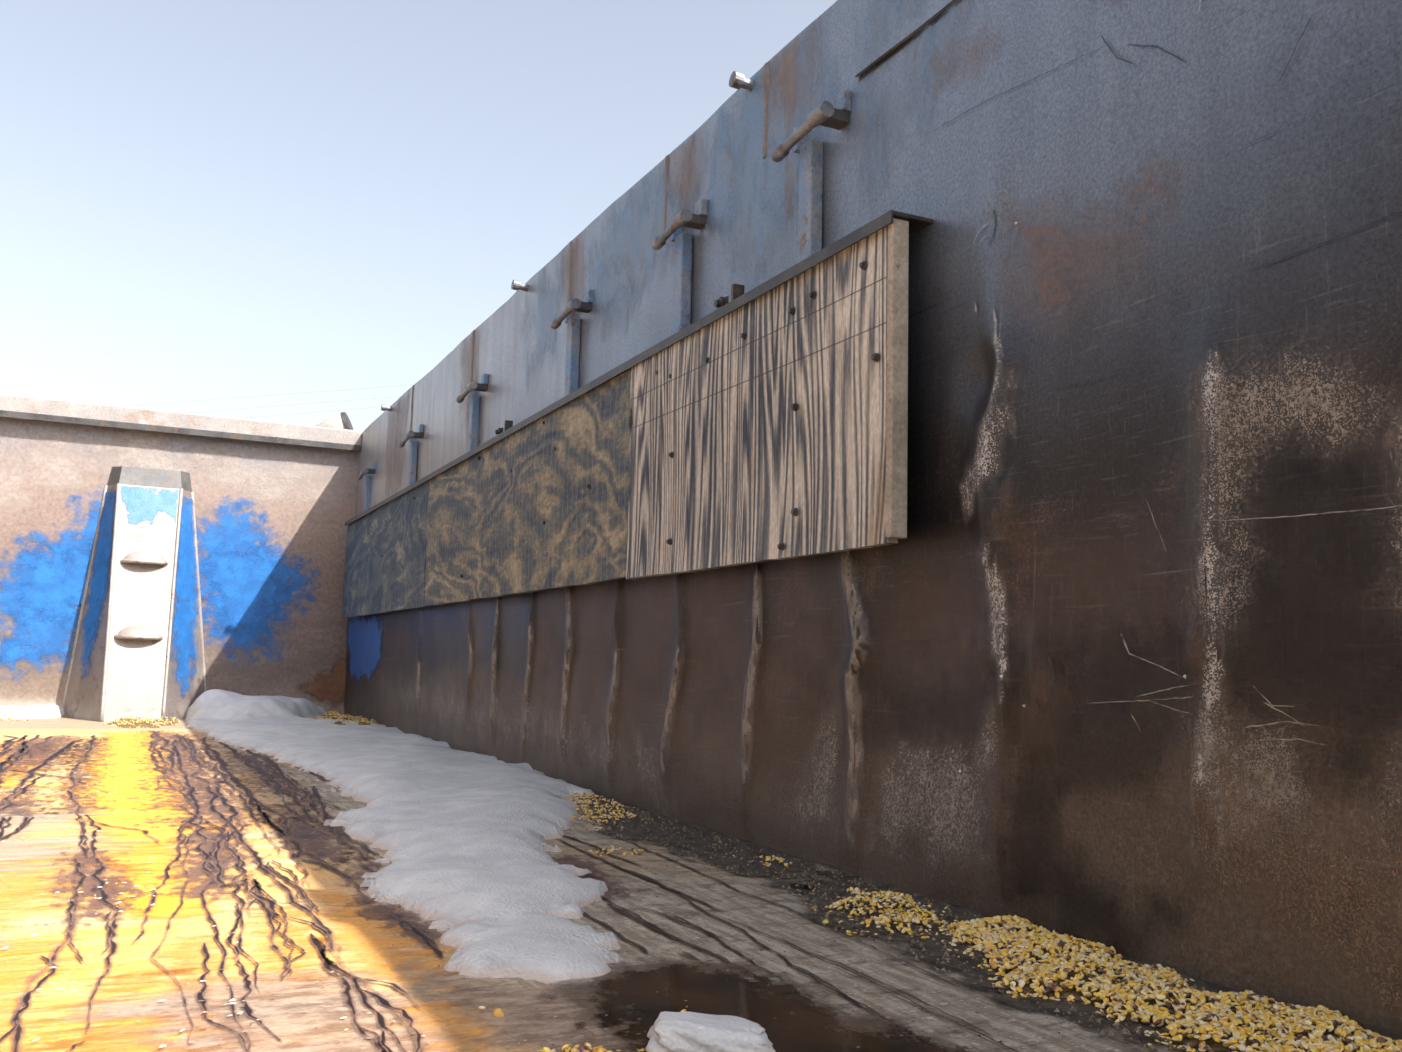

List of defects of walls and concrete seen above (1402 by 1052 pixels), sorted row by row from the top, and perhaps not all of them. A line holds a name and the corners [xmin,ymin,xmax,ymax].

peeling [0,485,318,694]